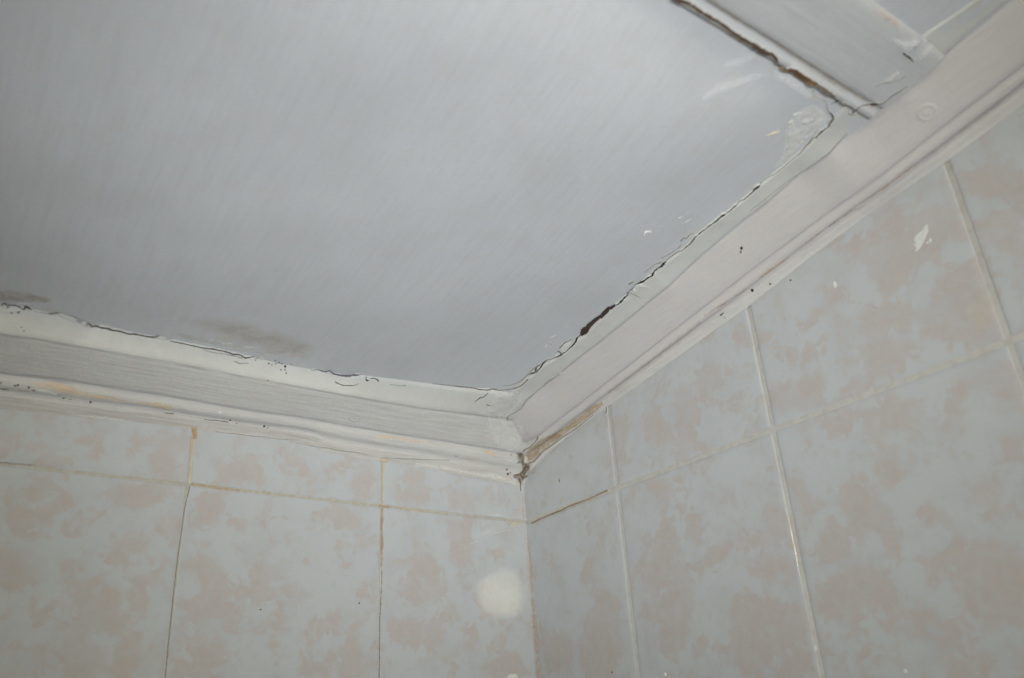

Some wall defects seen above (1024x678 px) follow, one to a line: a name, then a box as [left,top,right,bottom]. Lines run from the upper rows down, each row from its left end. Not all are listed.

crack [432,0,908,419]
crack [32,309,255,364]
crack [311,369,406,386]